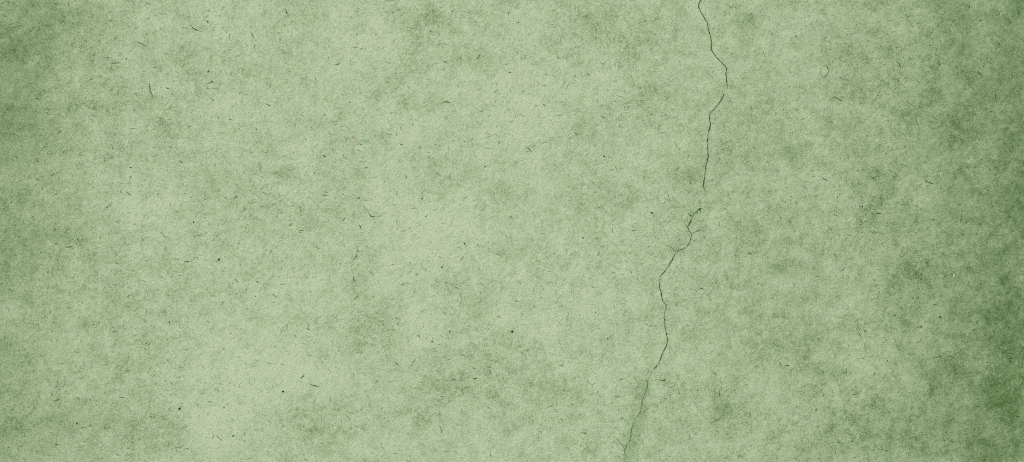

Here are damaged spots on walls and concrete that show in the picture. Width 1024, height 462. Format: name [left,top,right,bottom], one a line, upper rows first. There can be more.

crack [639,0,727,413]